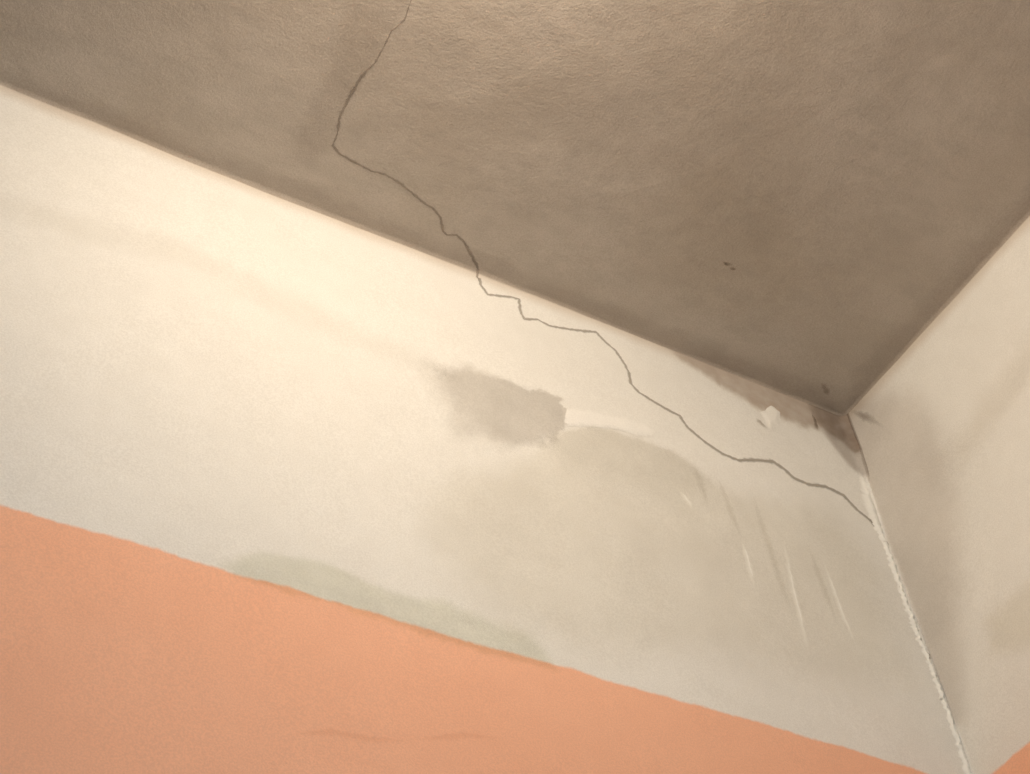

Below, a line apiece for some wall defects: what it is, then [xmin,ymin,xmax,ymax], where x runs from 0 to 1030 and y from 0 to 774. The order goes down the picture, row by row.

crack [332,1,874,526]
water stain [560,406,659,437]